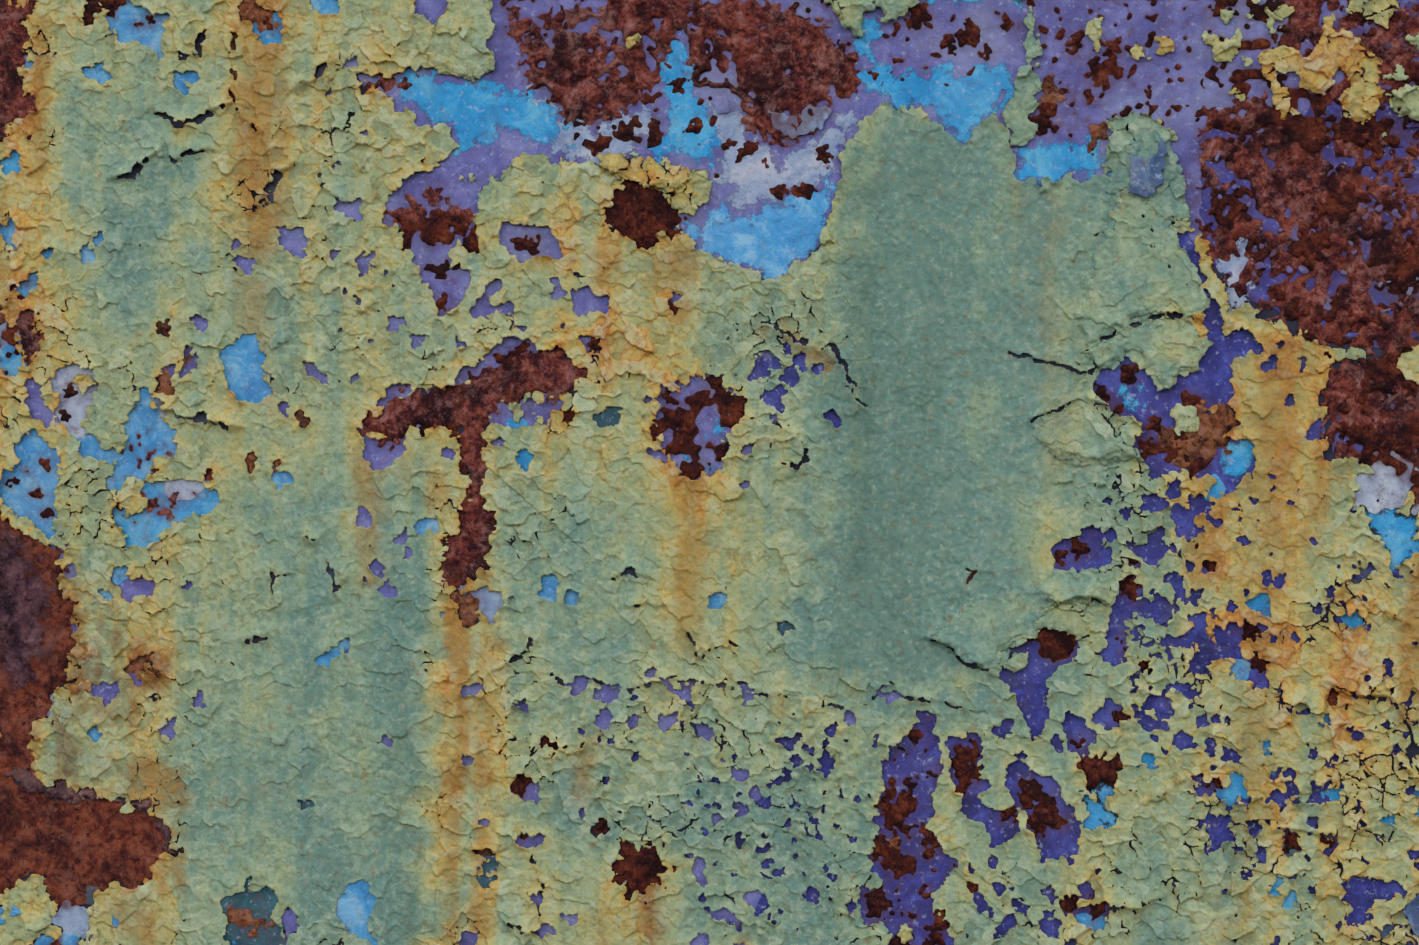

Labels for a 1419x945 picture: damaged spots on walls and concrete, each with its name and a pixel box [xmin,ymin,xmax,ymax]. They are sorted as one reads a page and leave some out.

corrosion [518,0,861,147]
peeling [0,215,20,252]
peeling [0,150,21,175]
peeling [276,226,308,259]
peeling [0,247,229,603]
peeling [245,451,257,474]
corrosion [357,336,588,716]
corrosion [643,365,778,480]
peeling [330,0,1419,945]
corrosion [1177,0,1419,701]
corrosion [0,510,184,907]
peeling [87,652,161,707]